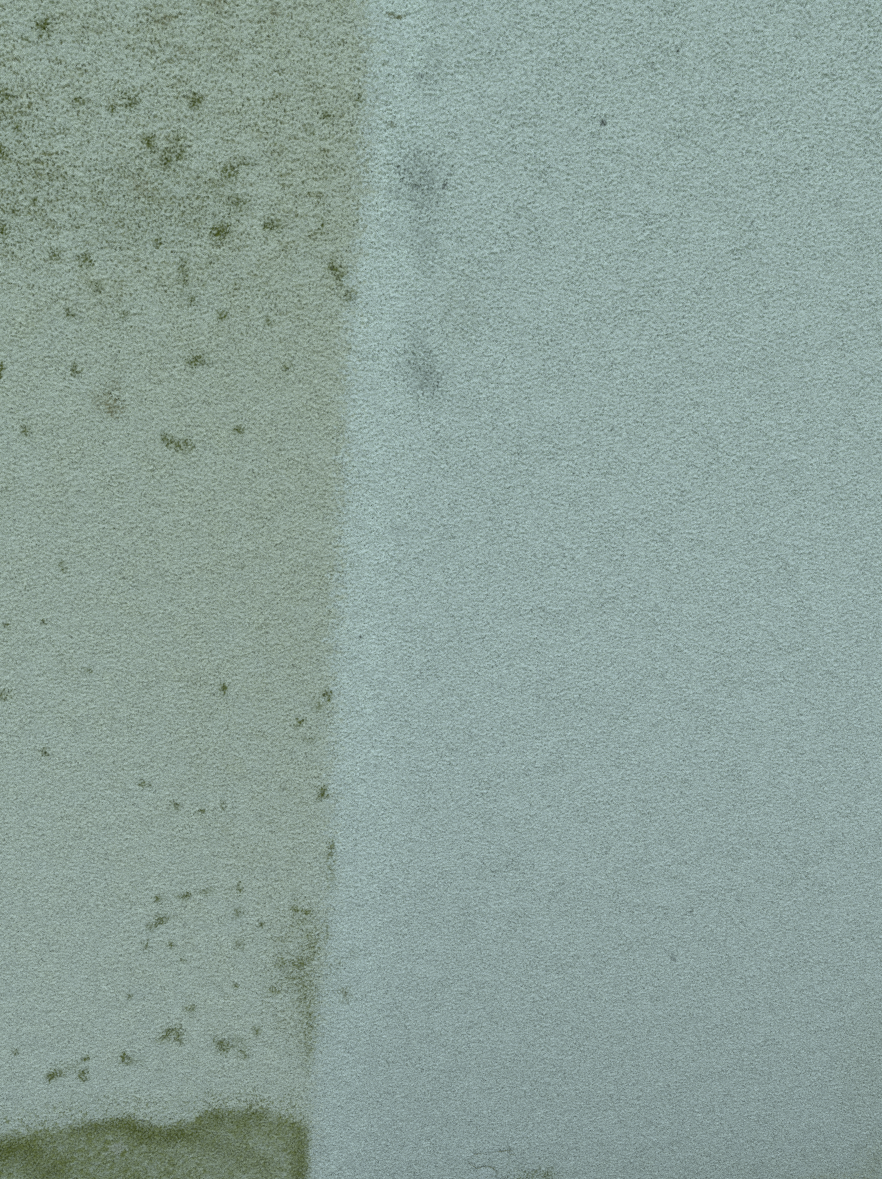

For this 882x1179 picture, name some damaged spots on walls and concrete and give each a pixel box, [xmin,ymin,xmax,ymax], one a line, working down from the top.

water stain [191,0,232,25]
water stain [121,168,164,206]
water stain [81,374,130,424]
water stain [323,838,339,902]
water stain [264,903,362,1081]